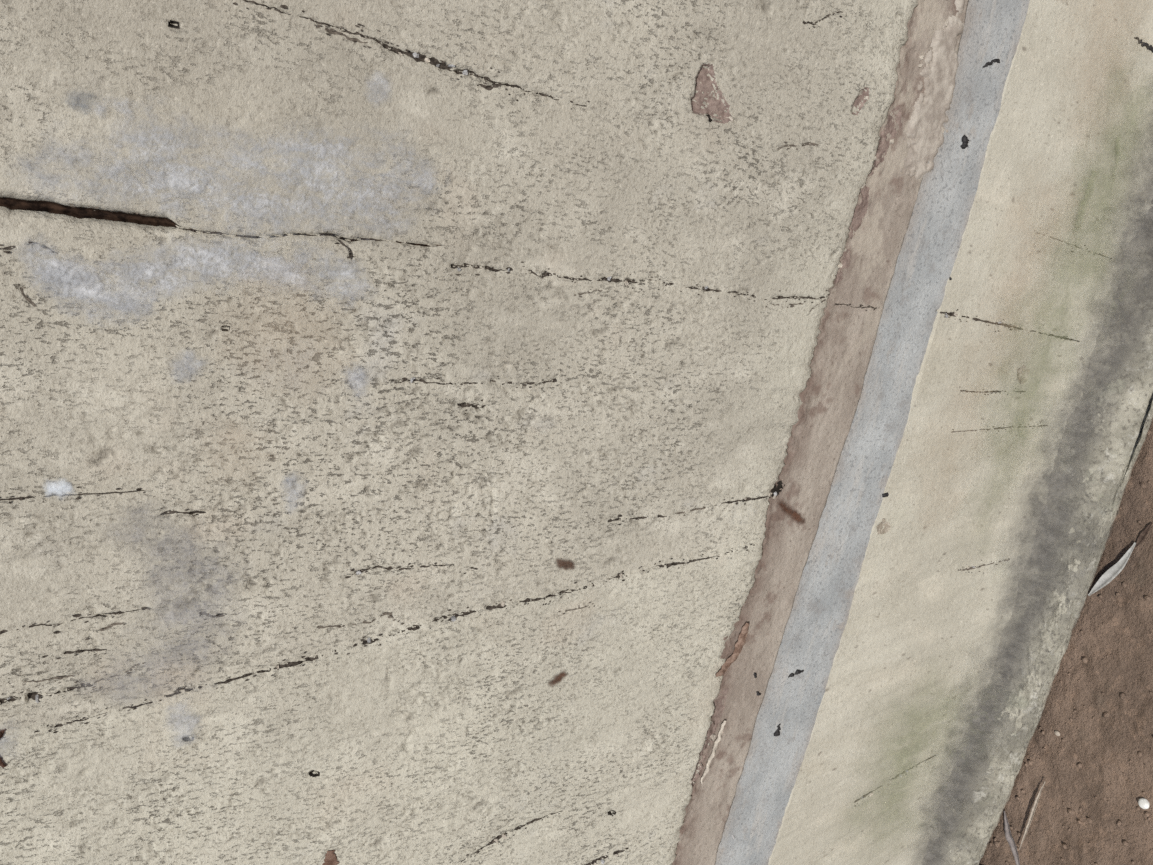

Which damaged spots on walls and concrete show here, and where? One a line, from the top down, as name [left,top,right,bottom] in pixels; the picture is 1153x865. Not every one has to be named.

crack [233,0,590,109]
crack [69,203,159,217]
crack [0,241,58,254]
crack [335,239,354,260]
crack [18,284,36,306]
crack [451,261,877,315]
crack [0,487,205,516]
crack [600,492,777,525]
crack [0,544,755,733]
crack [461,811,562,862]
corrosion [322,850,339,865]
crack [585,847,628,865]